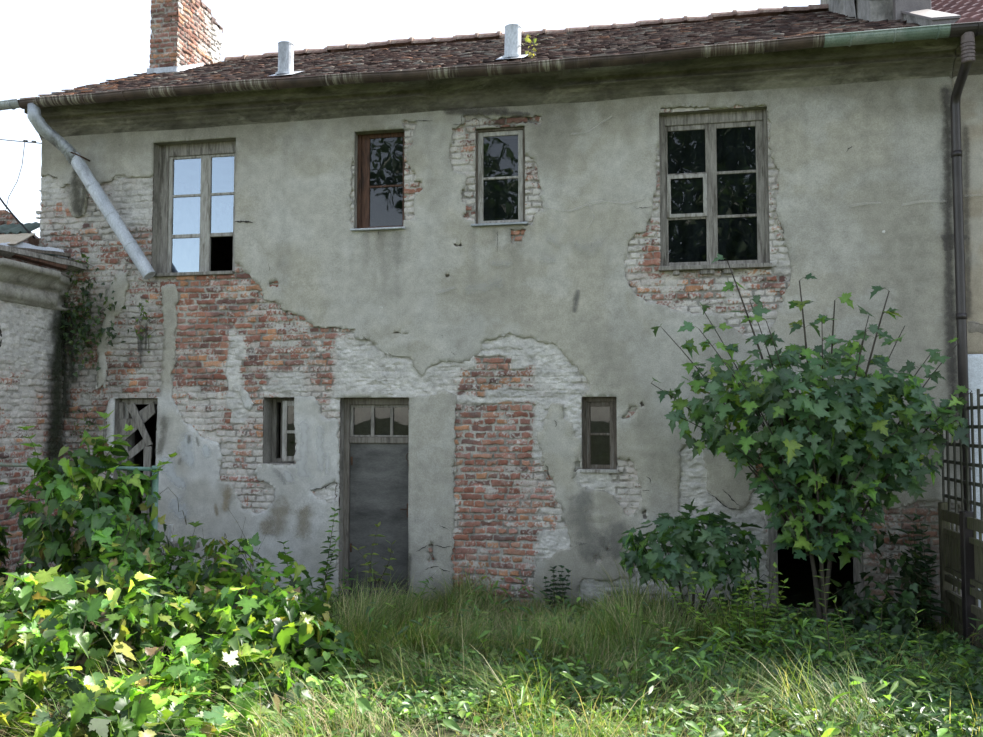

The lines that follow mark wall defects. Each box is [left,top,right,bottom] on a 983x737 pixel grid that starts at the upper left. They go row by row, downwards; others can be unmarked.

spalling [403,120,423,220]
spalling [449,114,542,221]
spalling [511,154,544,244]
spalling [624,105,792,337]
damp [942,87,958,417]
spalling [36,175,592,607]